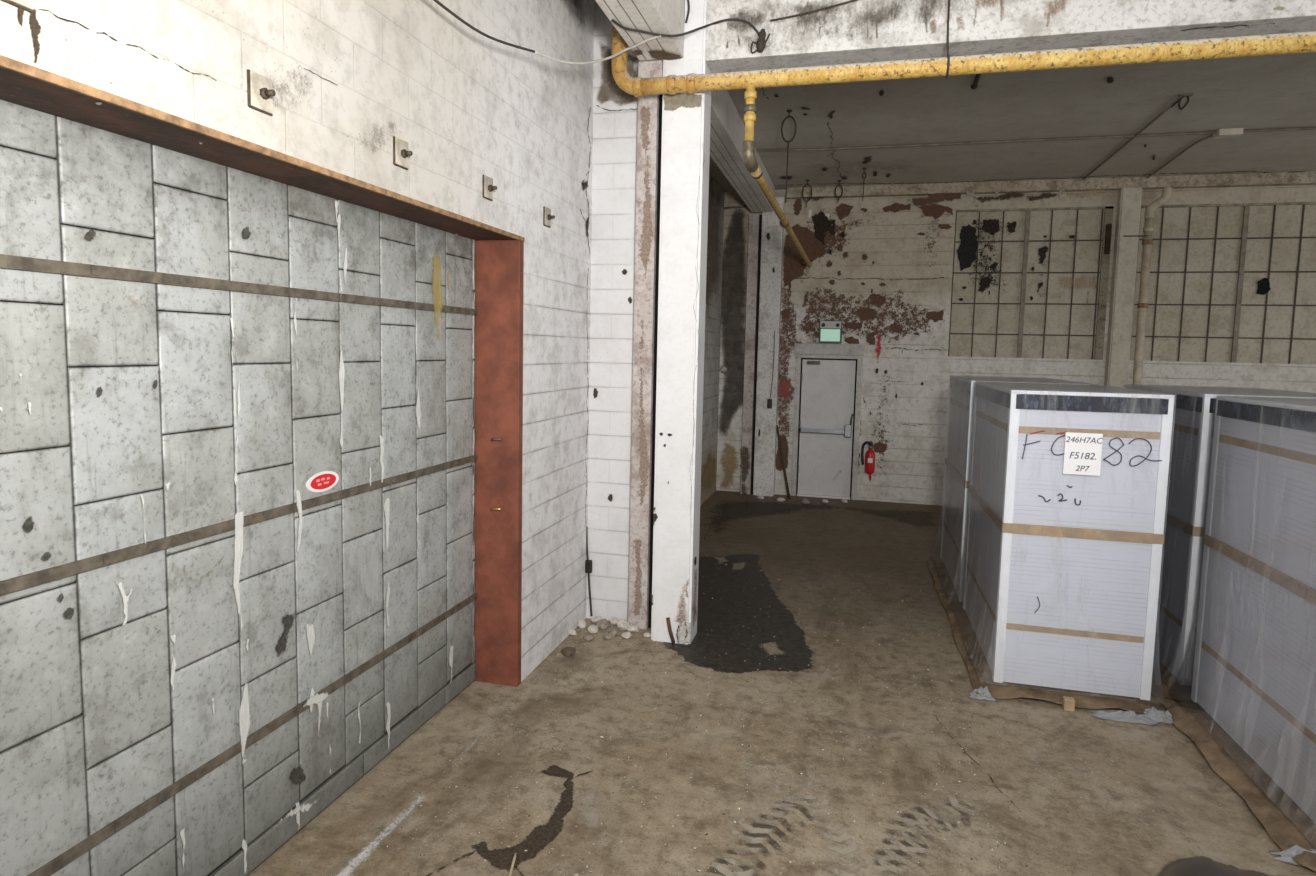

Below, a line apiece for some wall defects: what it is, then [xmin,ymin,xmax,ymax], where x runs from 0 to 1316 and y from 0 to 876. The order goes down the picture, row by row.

peeling [766,176,1065,476]
leakage [701,444,935,534]
leakage [664,554,815,674]